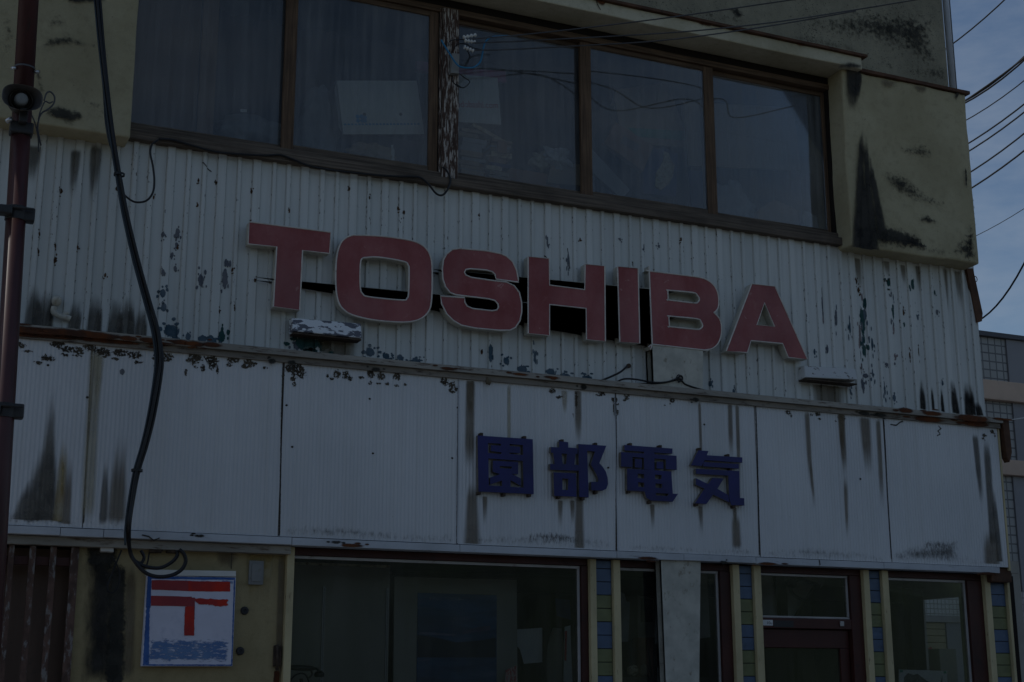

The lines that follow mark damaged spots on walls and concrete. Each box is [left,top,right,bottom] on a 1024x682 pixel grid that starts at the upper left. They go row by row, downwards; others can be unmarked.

leakage [853,138,935,278]
peeling [156,226,231,343]
leakage [14,423,71,524]
peeling [284,337,333,354]
peeling [361,344,425,362]
leakage [466,381,474,451]
leakage [466,493,487,544]
leakage [816,385,886,484]
peeling [813,275,920,404]
leakage [920,387,983,416]
leakage [973,438,1002,564]
leakage [86,548,134,682]